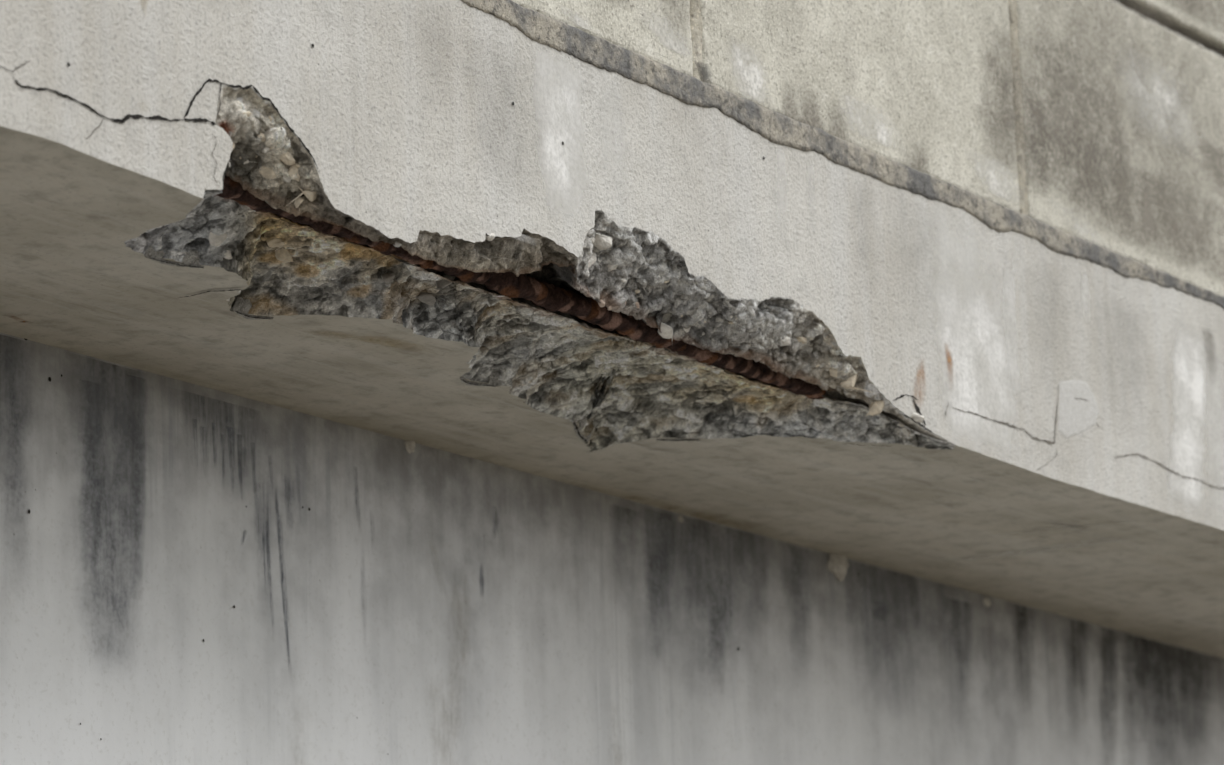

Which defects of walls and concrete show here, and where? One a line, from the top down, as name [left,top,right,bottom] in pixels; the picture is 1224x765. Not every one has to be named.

crack [1,60,320,183]
spalling [124,85,955,452]
efflorescence [936,282,1019,442]
crack [893,385,1099,471]
crack [1113,453,1224,489]
damp [1170,333,1224,503]